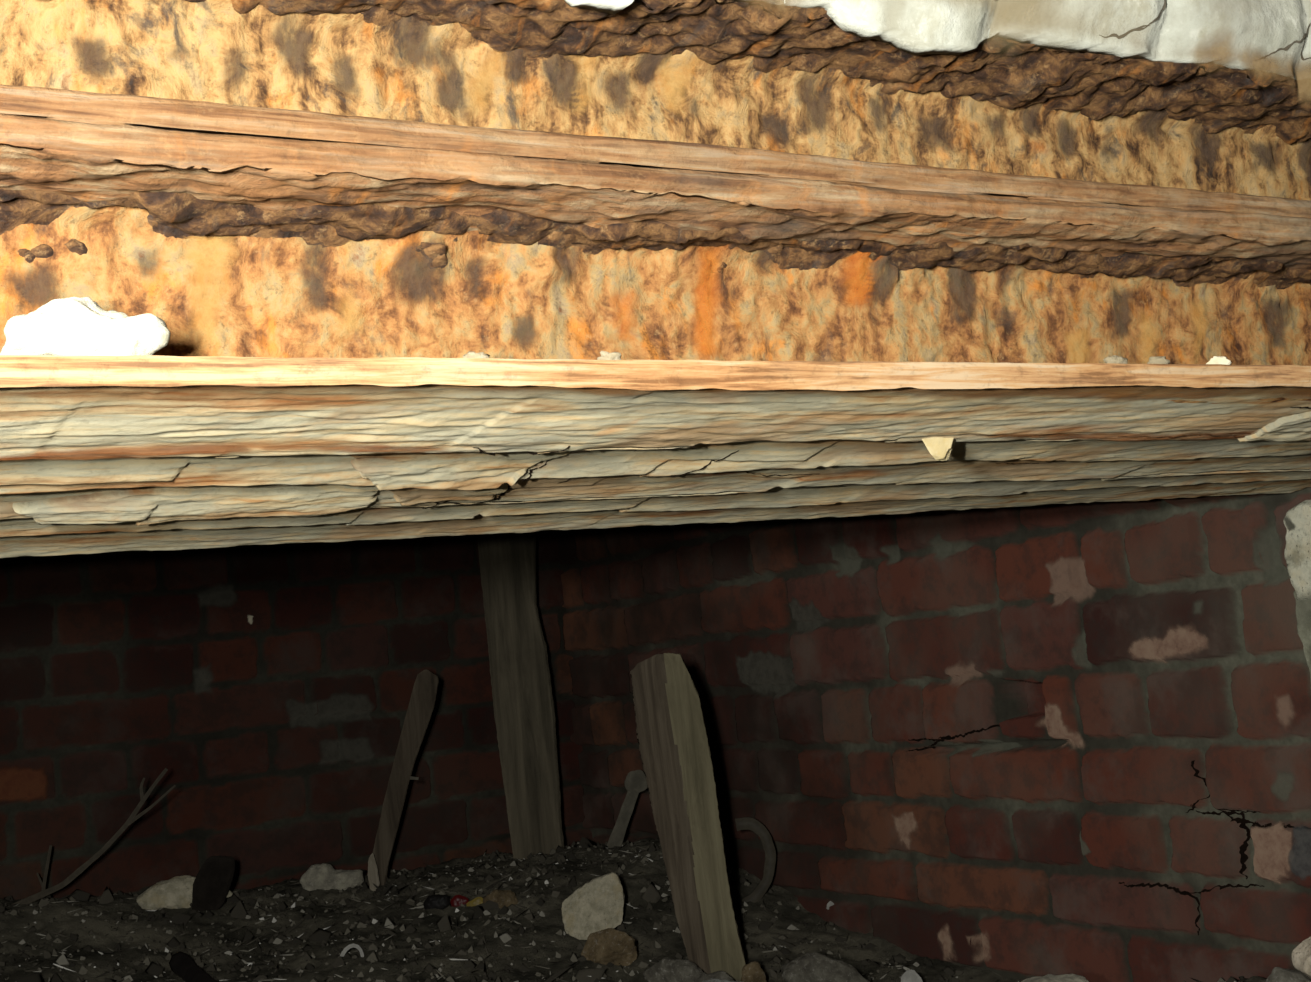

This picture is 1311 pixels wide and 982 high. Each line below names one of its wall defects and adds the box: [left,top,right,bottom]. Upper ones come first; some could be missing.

corrosion [352,6,463,110]
corrosion [0,188,1311,350]
corrosion [944,387,1311,399]
corrosion [1008,411,1311,442]
crack [401,446,591,509]
crack [658,446,812,477]
spalling [1046,558,1094,605]
spalling [1130,628,1207,662]
crack [908,725,1000,751]
spalling [1041,705,1083,747]
crack [1118,760,1311,935]
spalling [1251,823,1311,883]